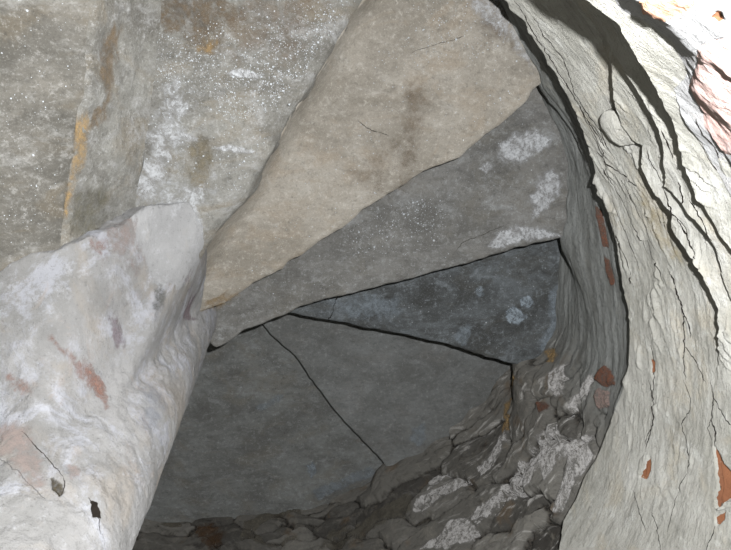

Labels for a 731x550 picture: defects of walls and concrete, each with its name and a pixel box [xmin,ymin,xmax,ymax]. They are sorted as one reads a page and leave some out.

corrosion [72,26,118,171]
damp [500,131,551,161]
damp [530,171,559,215]
damp [489,226,560,248]
crack [514,1,731,550]
crack [0,430,65,499]
spalling [51,479,63,496]
spalling [90,501,101,518]